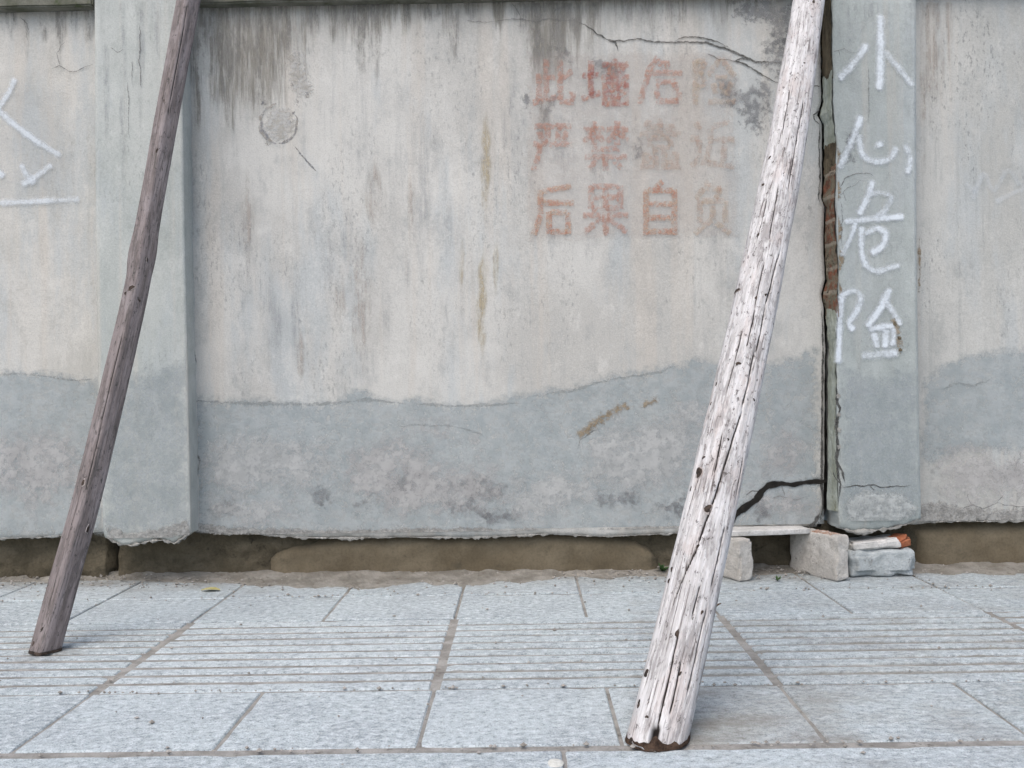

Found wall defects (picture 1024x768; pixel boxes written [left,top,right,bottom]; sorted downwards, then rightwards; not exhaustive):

crack [468,8,782,82]
water stain [733,1,790,65]
water stain [722,81,770,124]
crack [734,35,909,528]
water stain [0,373,97,535]
water stain [197,360,718,531]
corrosion [578,403,629,437]
water stain [735,352,820,525]
water stain [924,353,1024,461]